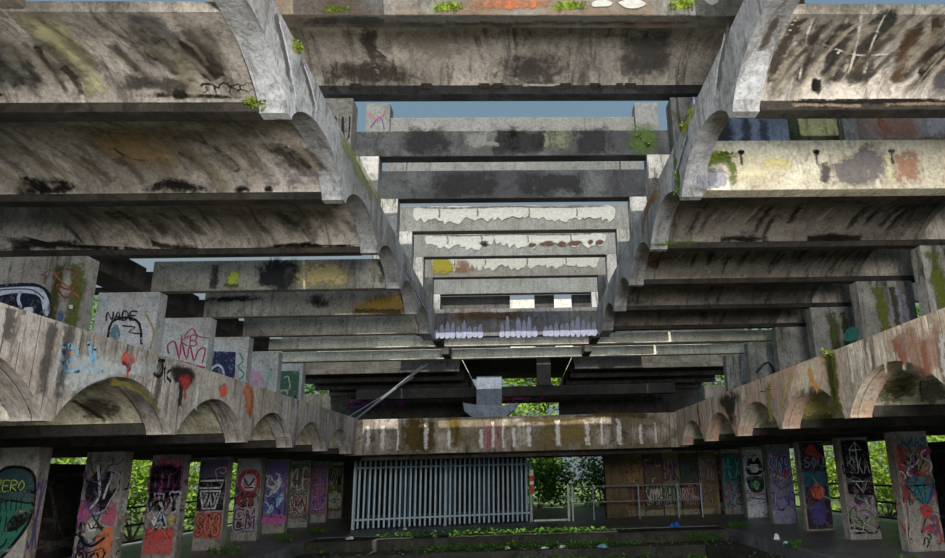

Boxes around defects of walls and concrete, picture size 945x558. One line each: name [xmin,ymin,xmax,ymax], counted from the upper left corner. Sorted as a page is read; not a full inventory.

damp [0,8,104,96]
damp [117,16,224,93]
damp [300,14,698,87]
damp [759,9,945,97]
damp [18,176,75,195]
damp [90,129,213,193]
damp [405,127,449,154]
damp [467,126,549,155]
damp [575,126,610,153]
peeling [413,205,615,272]
rust [433,233,604,247]
damp [479,413,657,448]